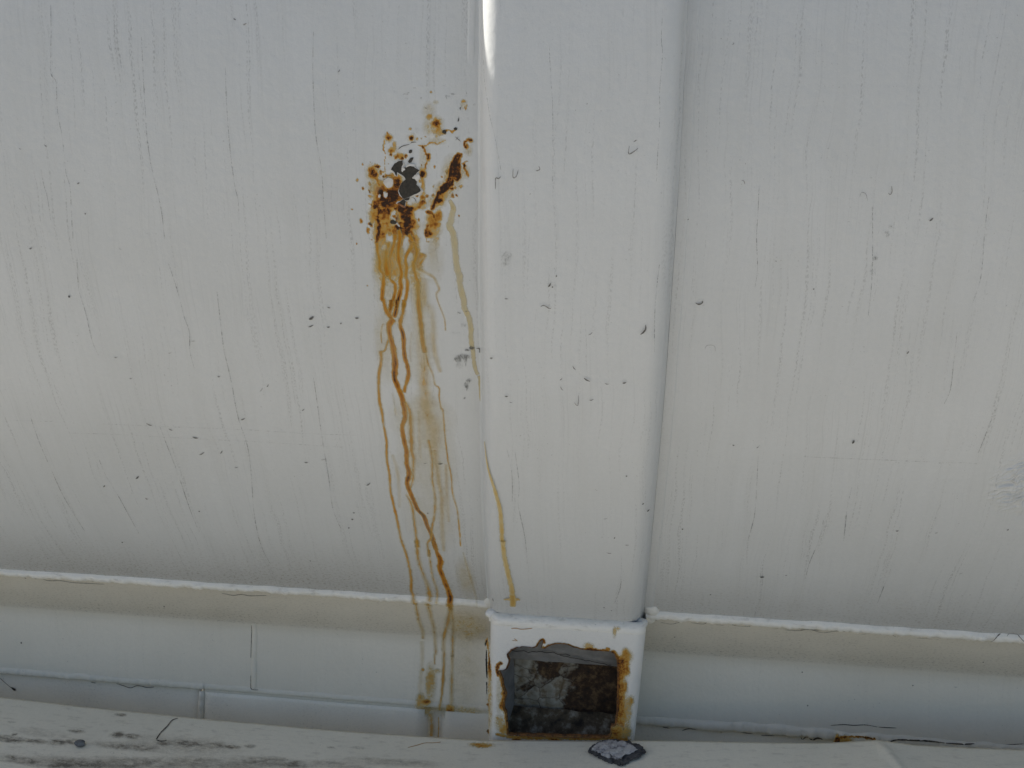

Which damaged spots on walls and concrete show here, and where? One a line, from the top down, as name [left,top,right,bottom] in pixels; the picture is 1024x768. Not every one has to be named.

peeling [378,150,423,208]
rust [351,114,480,748]
rust [484,442,520,607]
rust [470,638,634,748]